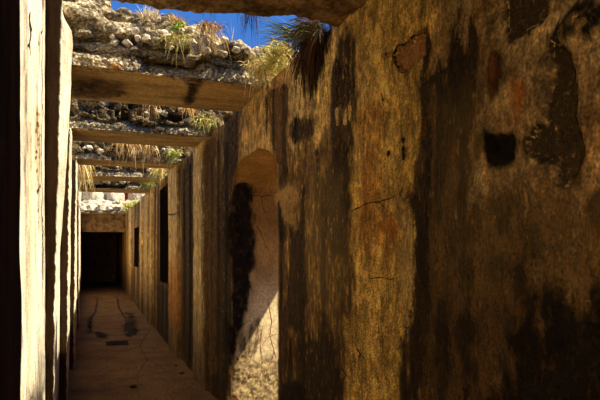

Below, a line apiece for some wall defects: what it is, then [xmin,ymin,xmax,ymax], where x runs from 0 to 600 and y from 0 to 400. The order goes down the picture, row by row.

spalling [381,29,431,74]
spalling [480,32,586,192]
damp [265,23,357,400]
crack [352,187,406,211]
damp [399,7,600,400]